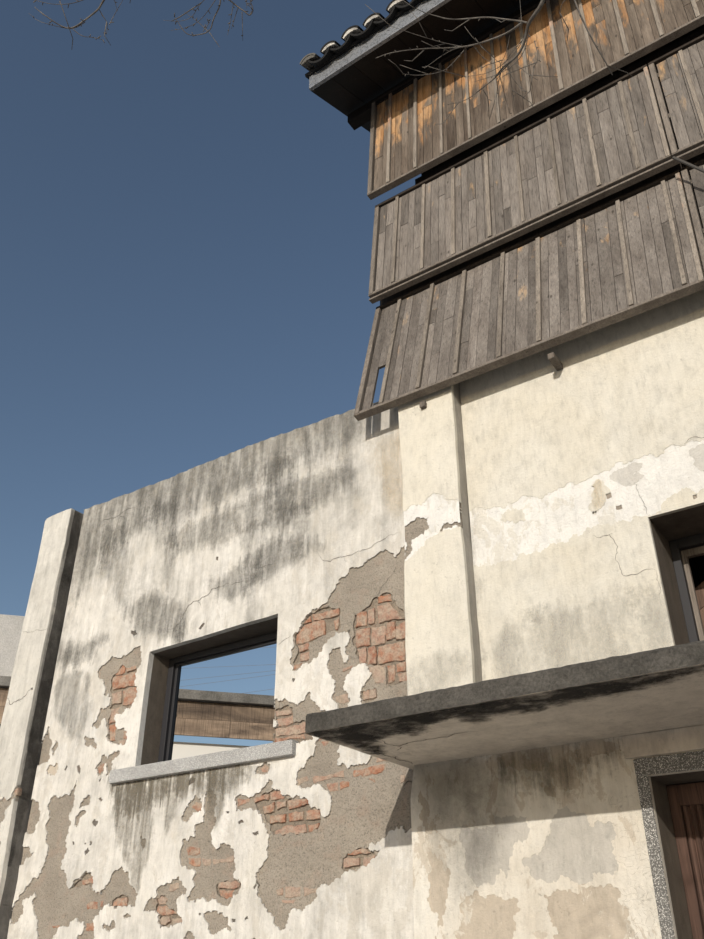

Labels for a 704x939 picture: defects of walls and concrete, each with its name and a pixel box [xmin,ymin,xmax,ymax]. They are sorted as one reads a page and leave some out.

damp [127,433,287,524]
peeling [291,440,704,708]
peeling [0,785,22,823]
peeling [39,730,81,775]
peeling [85,646,142,781]
peeling [11,786,248,939]
damp [111,764,244,883]
peeling [227,692,451,939]
damp [305,665,704,754]
peeling [454,737,632,939]